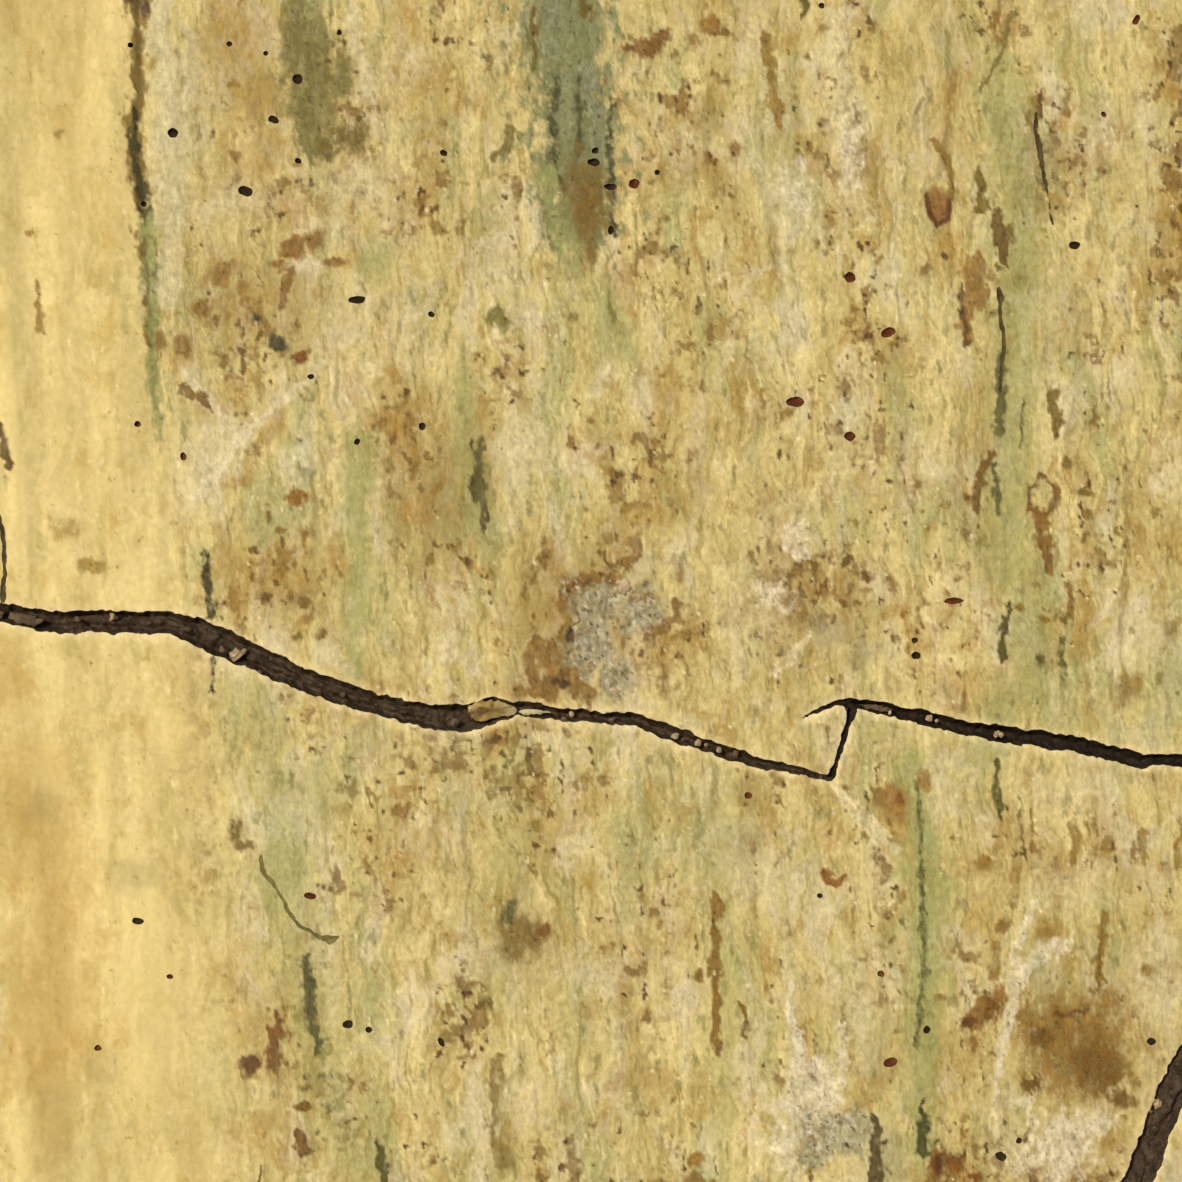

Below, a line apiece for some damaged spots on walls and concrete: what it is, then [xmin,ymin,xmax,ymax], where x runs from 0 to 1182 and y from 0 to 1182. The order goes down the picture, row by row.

damp [524,0,620,287]
corrosion [920,135,958,235]
crack [0,515,1182,781]
flaking render [558,560,682,712]
crack [259,854,339,945]
crack [1120,1045,1182,1182]